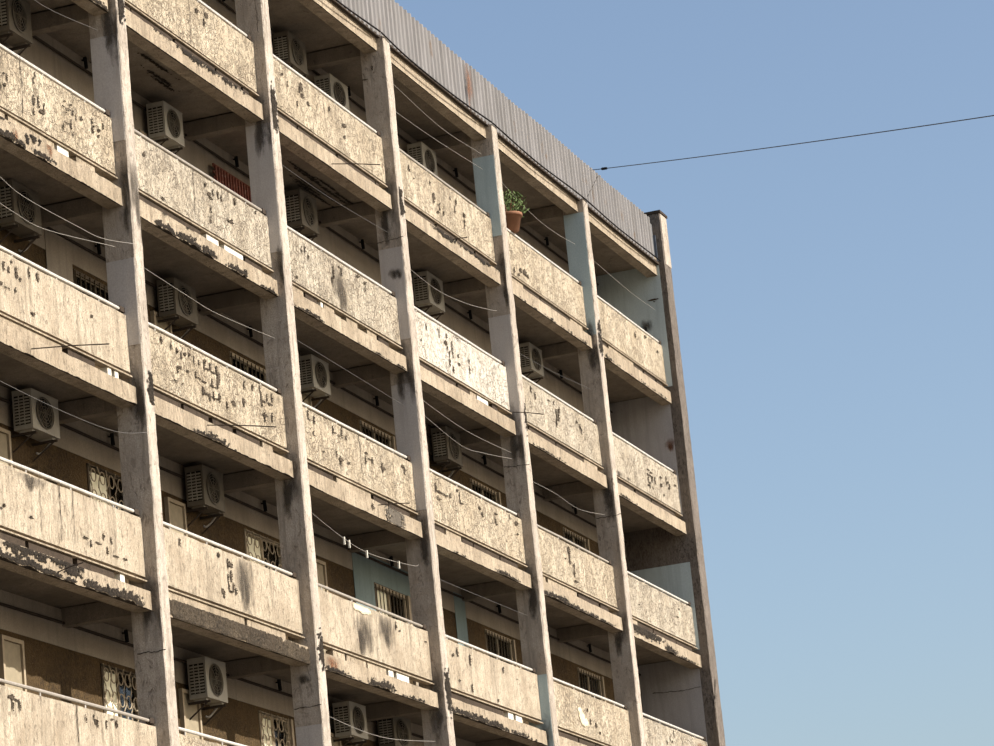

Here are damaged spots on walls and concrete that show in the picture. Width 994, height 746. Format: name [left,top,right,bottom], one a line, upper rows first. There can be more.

damp [102,0,118,45]
spalling [0,116,57,165]
peeling [62,100,104,137]
spalling [155,213,248,277]
spalling [147,371,155,405]
peeling [160,335,273,423]
spalling [0,541,145,607]
peeling [218,552,238,599]